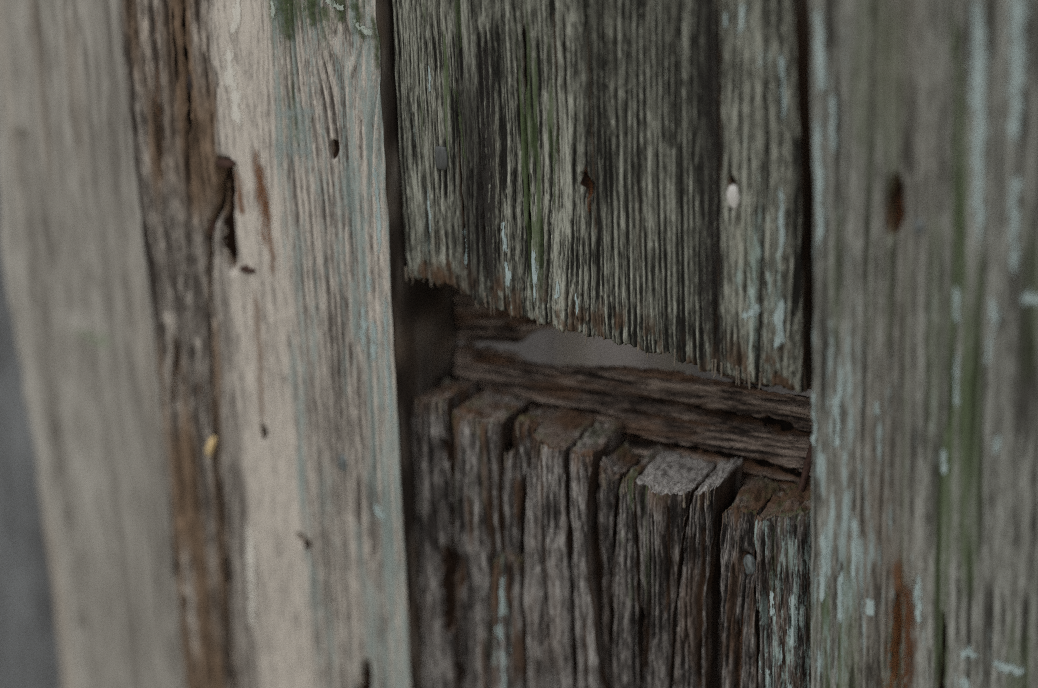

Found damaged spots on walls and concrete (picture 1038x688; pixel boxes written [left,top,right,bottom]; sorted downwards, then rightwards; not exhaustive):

crack [171,6,193,156]
corrosion [254,152,273,272]
corrosion [887,565,902,688]